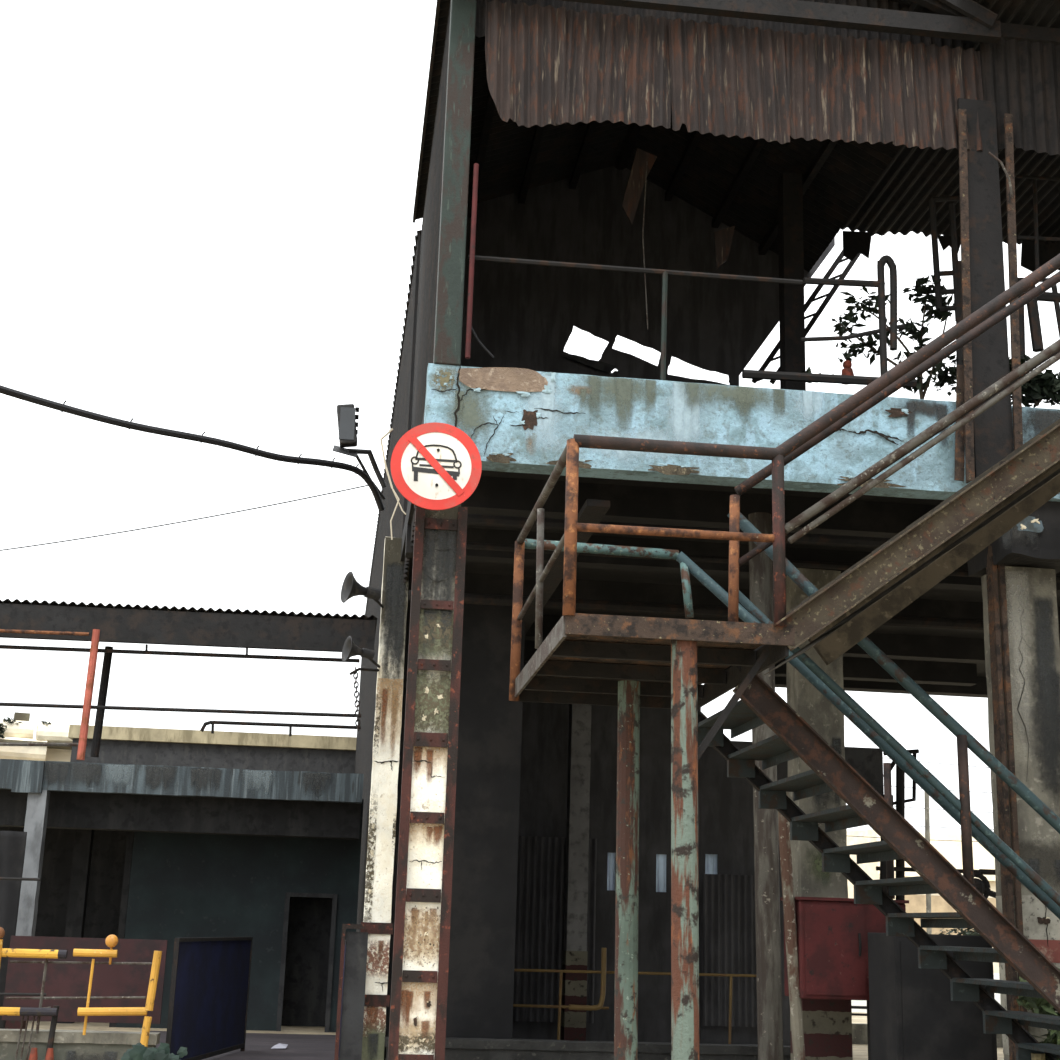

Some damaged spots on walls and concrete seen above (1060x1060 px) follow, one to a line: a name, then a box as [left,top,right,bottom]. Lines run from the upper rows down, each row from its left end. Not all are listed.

spalling [432,367,556,430]
crack [432,365,586,454]
damp [528,376,559,444]
damp [569,376,656,421]
damp [602,382,785,458]
crack [836,428,902,445]
rust [413,744,448,778]
rust [409,823,444,842]
rust [403,908,440,953]
damp [367,1006,378,1059]
rust [399,982,438,1044]